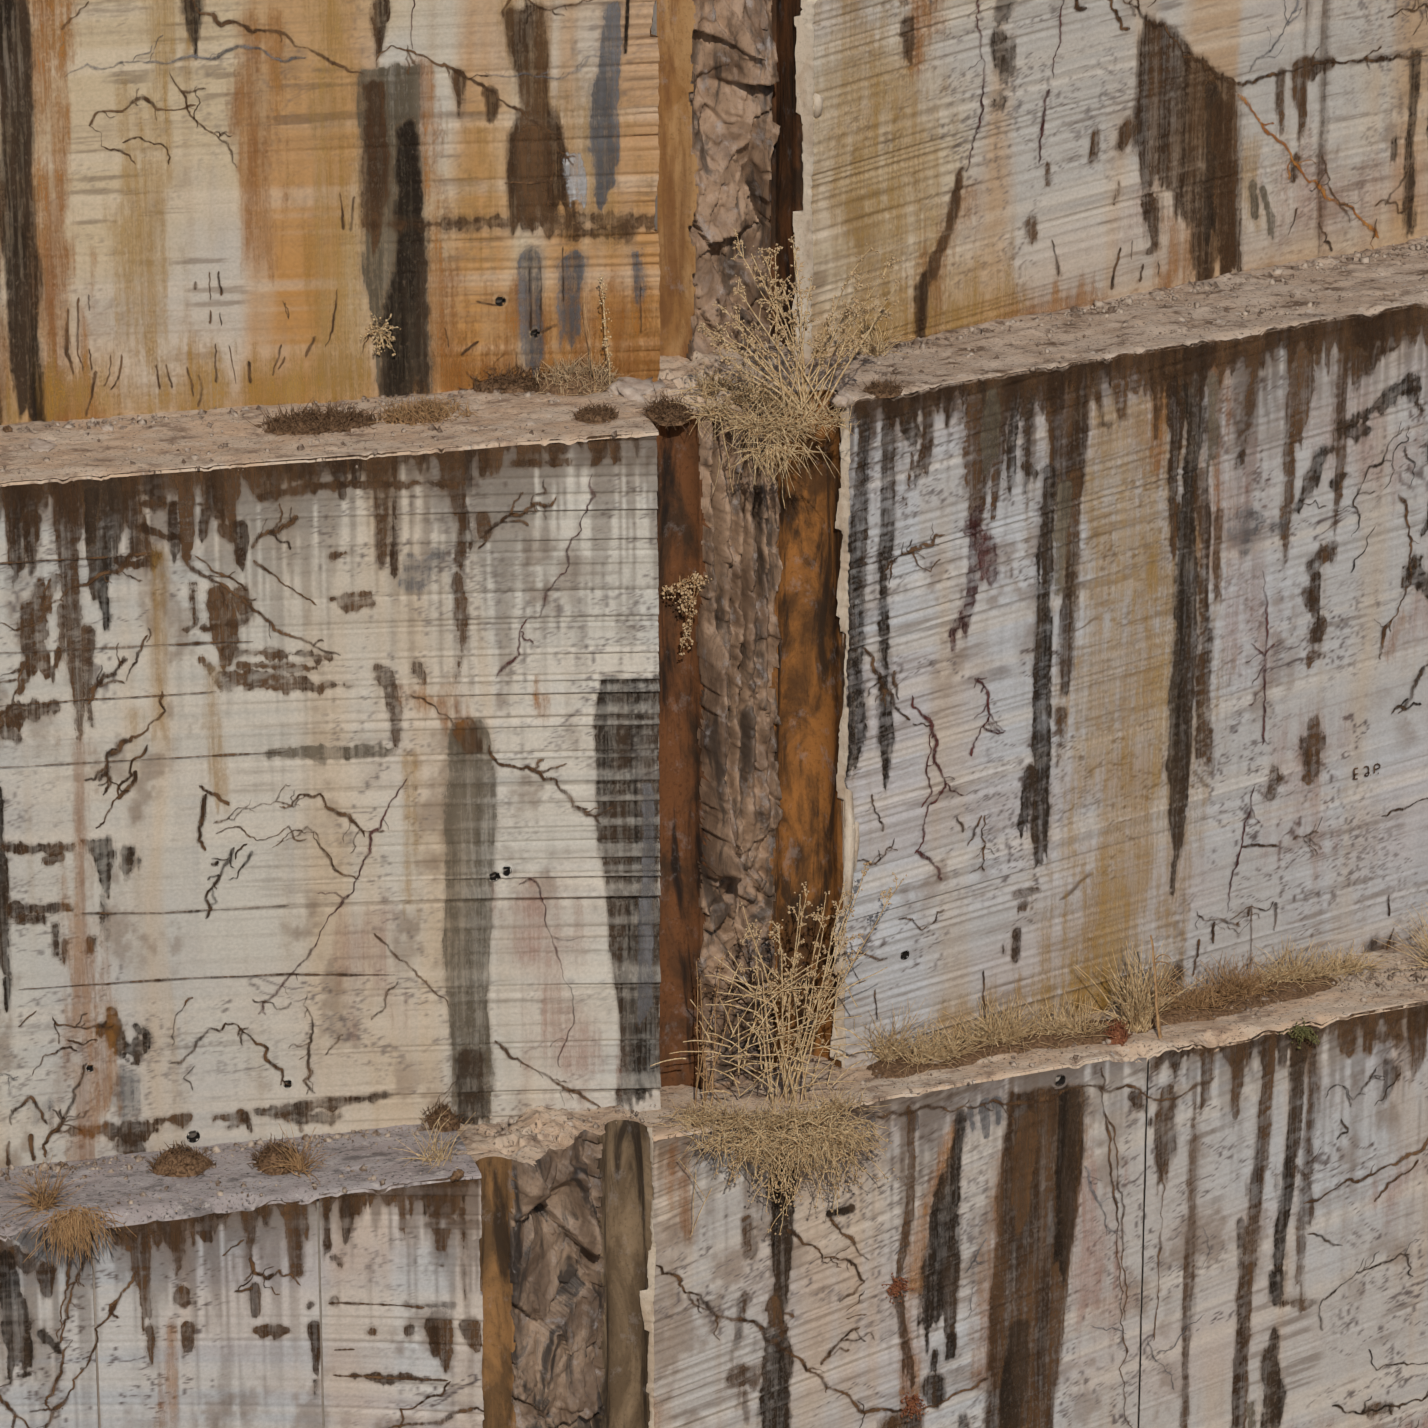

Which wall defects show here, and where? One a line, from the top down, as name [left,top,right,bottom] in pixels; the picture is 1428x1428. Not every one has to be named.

water stain [0,0,45,425]
corrosion [31,0,97,422]
corrosion [234,84,263,240]
crack [1039,0,1428,251]
crack [0,503,341,723]
water stain [0,434,639,743]
crack [170,778,408,1094]
crack [854,647,1004,931]
water stain [106,1178,478,1364]
crack [656,1217,989,1428]
water stain [878,1084,1089,1428]
water stain [1128,1001,1428,1428]